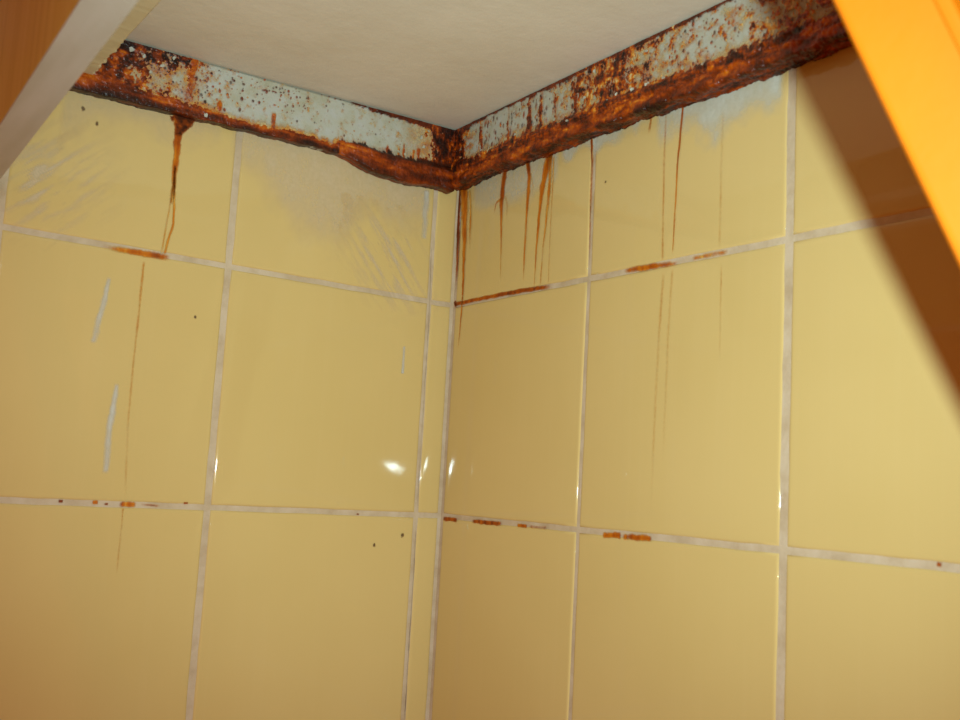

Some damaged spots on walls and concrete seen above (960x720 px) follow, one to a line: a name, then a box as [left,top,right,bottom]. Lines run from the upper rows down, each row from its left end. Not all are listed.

rust [69,0,854,336]
rust [603,532,651,541]